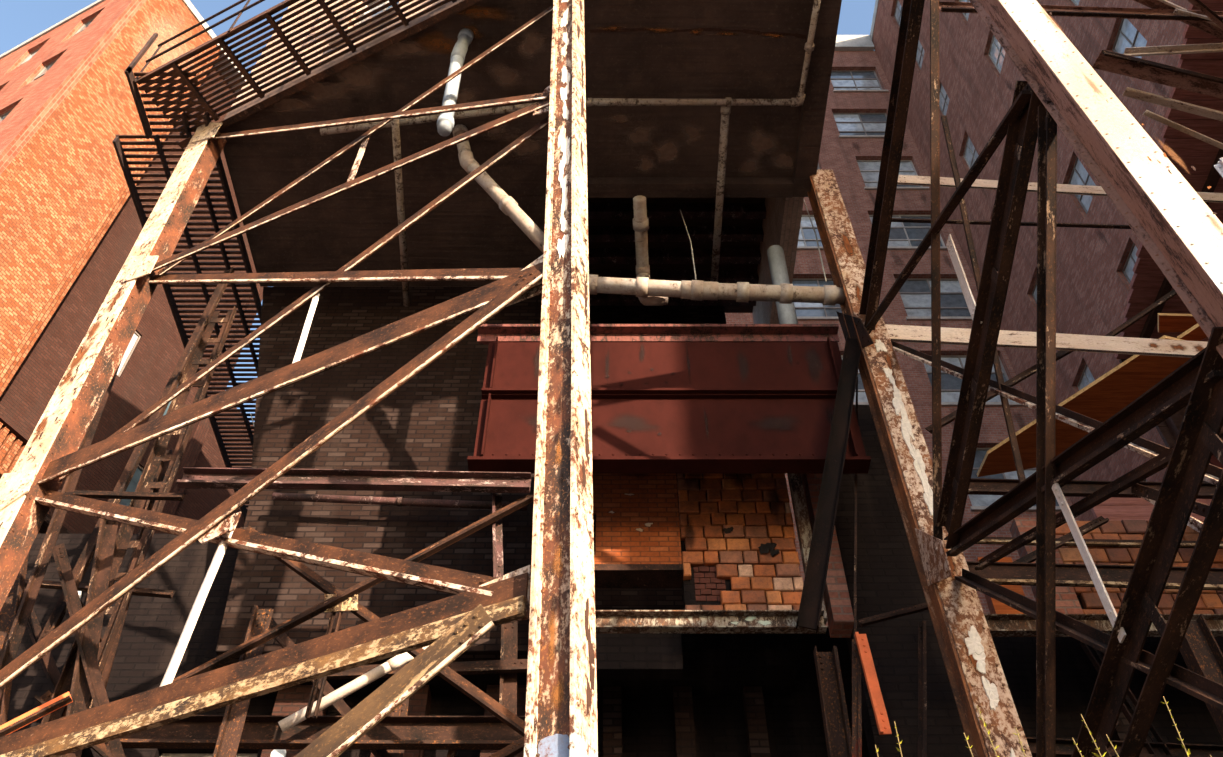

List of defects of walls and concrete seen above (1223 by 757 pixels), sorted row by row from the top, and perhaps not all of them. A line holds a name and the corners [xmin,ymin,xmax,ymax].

corrosion [841,232,855,257]
peeling [874,340,887,353]
corrosion [554,433,562,483]
peeling [582,409,590,489]
peeling [883,368,933,516]
corrosion [554,519,562,572]
spalling [758,543,779,557]
spalling [693,565,726,601]
corrosion [549,596,560,657]
peeling [585,598,595,717]
peeling [965,626,999,711]